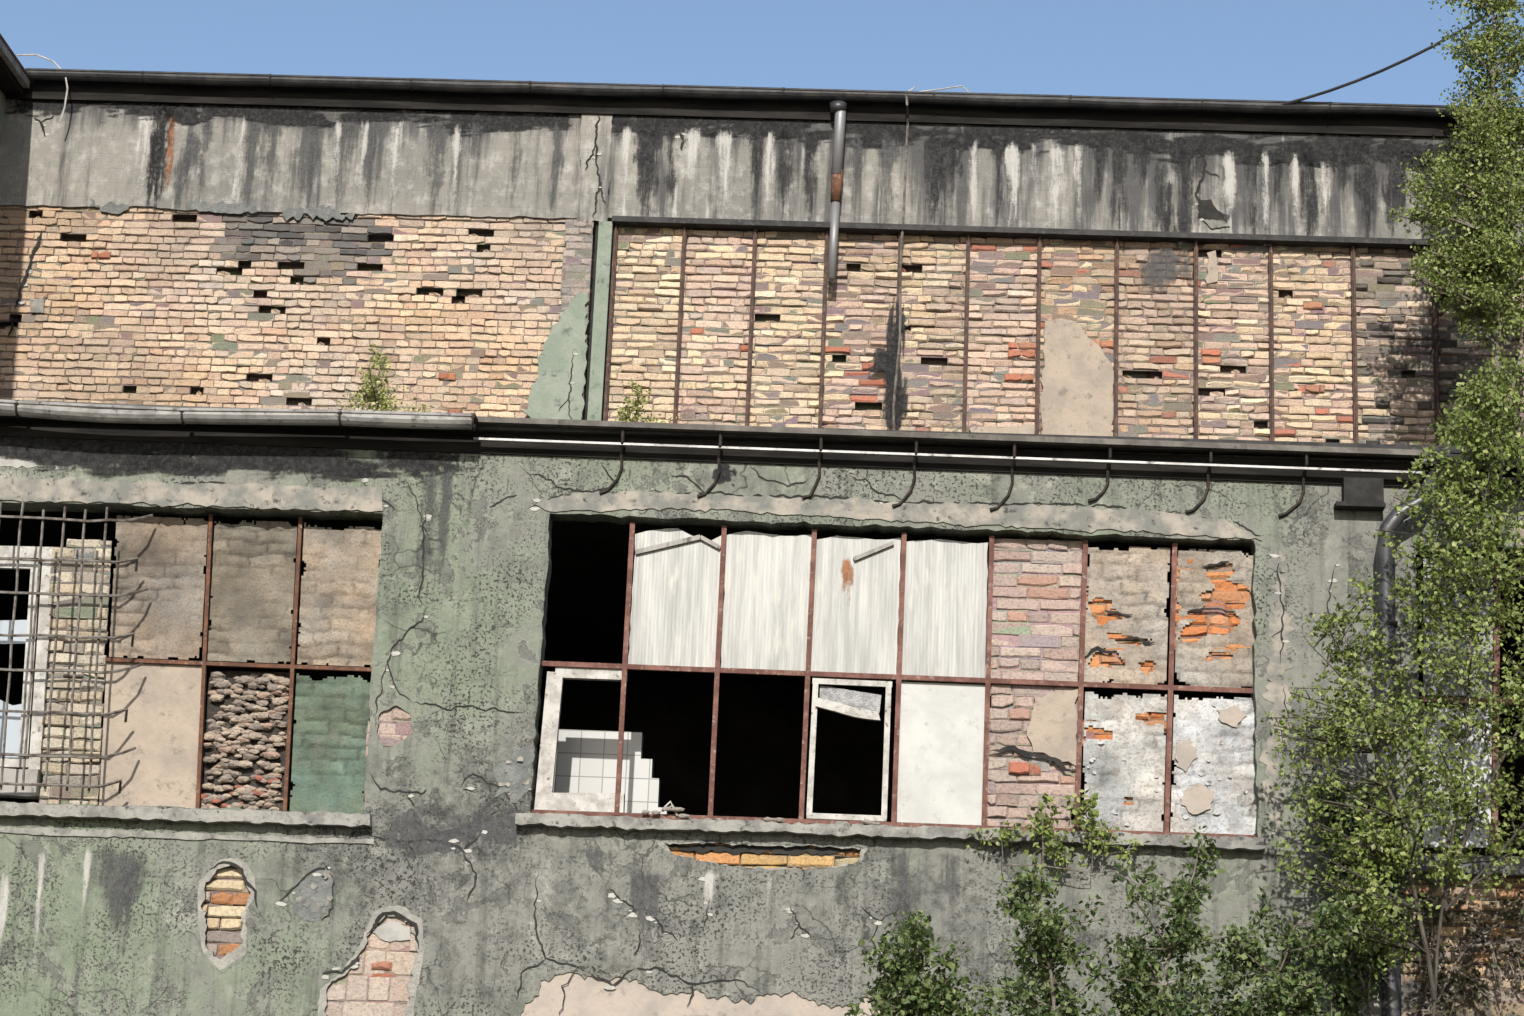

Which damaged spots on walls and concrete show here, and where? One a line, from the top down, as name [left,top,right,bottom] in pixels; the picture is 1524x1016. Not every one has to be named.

leakage [136,107,212,209]
leakage [621,129,731,215]
leakage [749,133,819,213]
leakage [924,135,1408,244]
peeling [523,292,589,420]
crack [360,478,524,713]
spalling [197,858,257,970]
spalling [318,905,426,1016]
crack [516,872,769,1016]
peeling [520,972,896,1016]
crack [785,905,811,938]
spalling [1399,877,1524,1016]